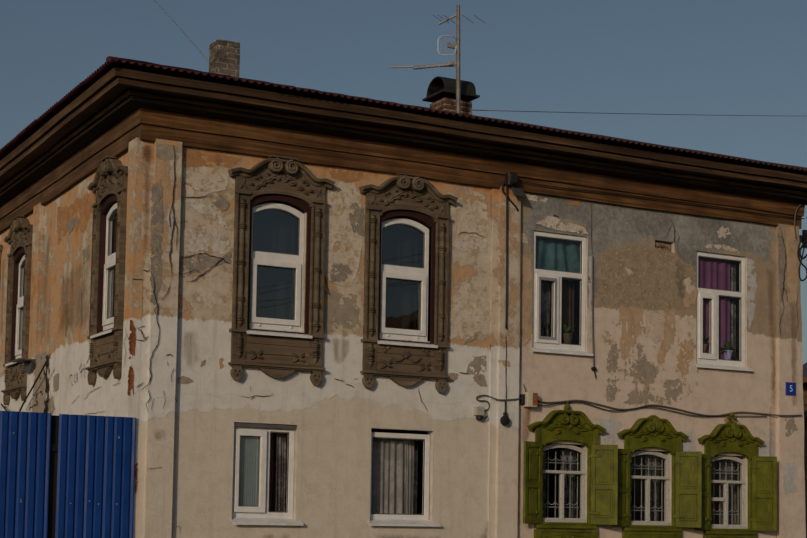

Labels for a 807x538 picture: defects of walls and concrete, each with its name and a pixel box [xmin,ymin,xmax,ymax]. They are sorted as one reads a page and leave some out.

flaking render [57,192,96,244]
crack [71,144,231,415]
flaking render [150,147,242,305]
flaking render [448,190,533,346]
flaking render [655,241,672,252]
flaking render [706,226,757,328]
flaking render [127,320,136,396]
peeling [446,355,488,387]
peeling [606,277,697,406]